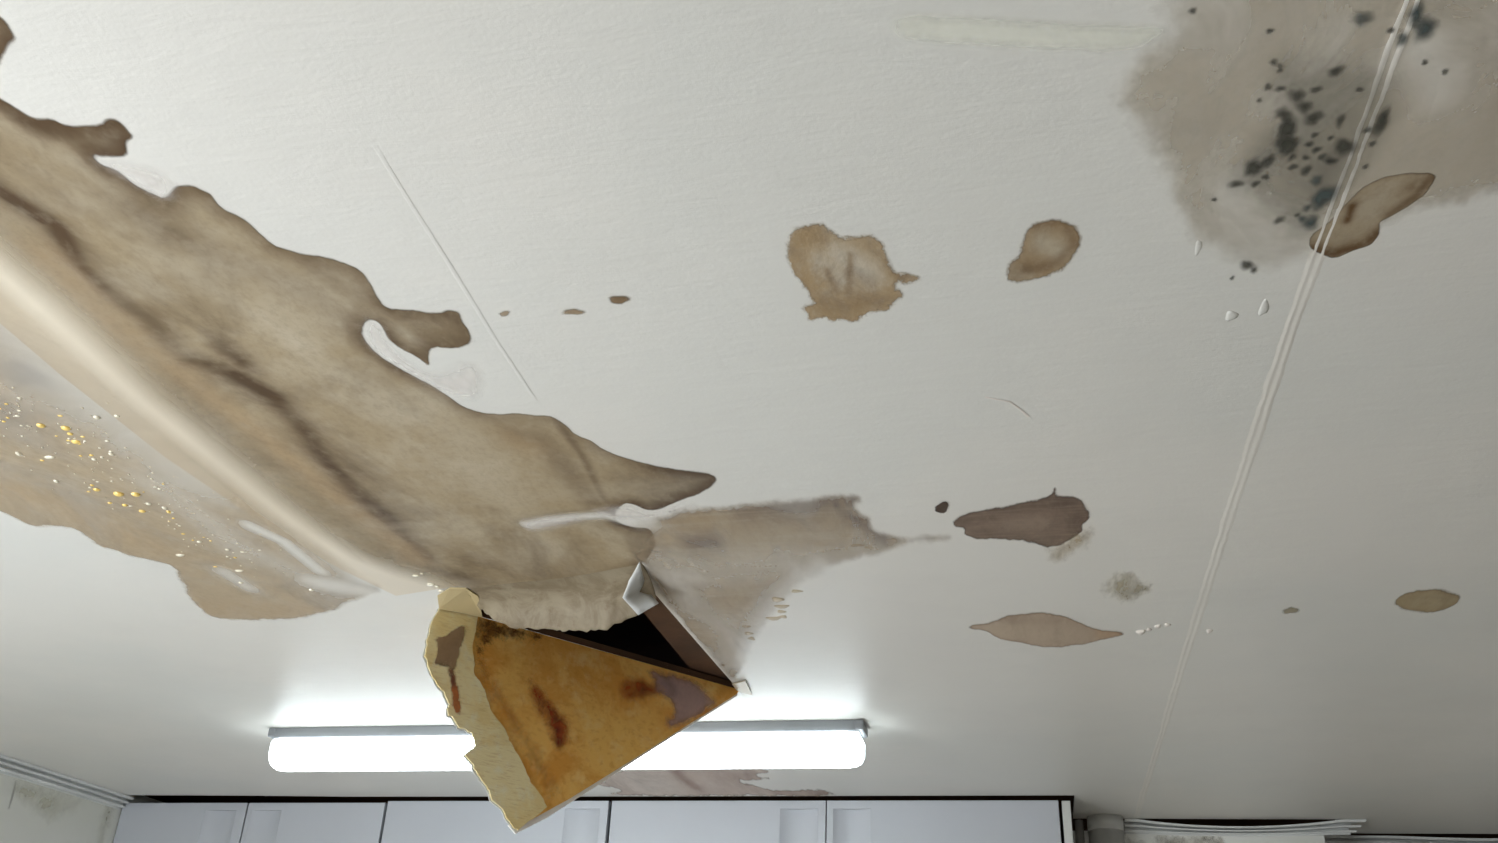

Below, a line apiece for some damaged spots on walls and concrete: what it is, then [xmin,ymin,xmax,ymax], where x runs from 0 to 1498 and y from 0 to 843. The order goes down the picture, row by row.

damp [0,18,14,58]
mould [1388,5,1434,44]
mould [1231,61,1388,228]
damp [787,224,918,322]
damp [1007,220,1080,282]
damp [0,99,898,676]
peeling [467,561,659,632]
peeling [742,590,803,640]